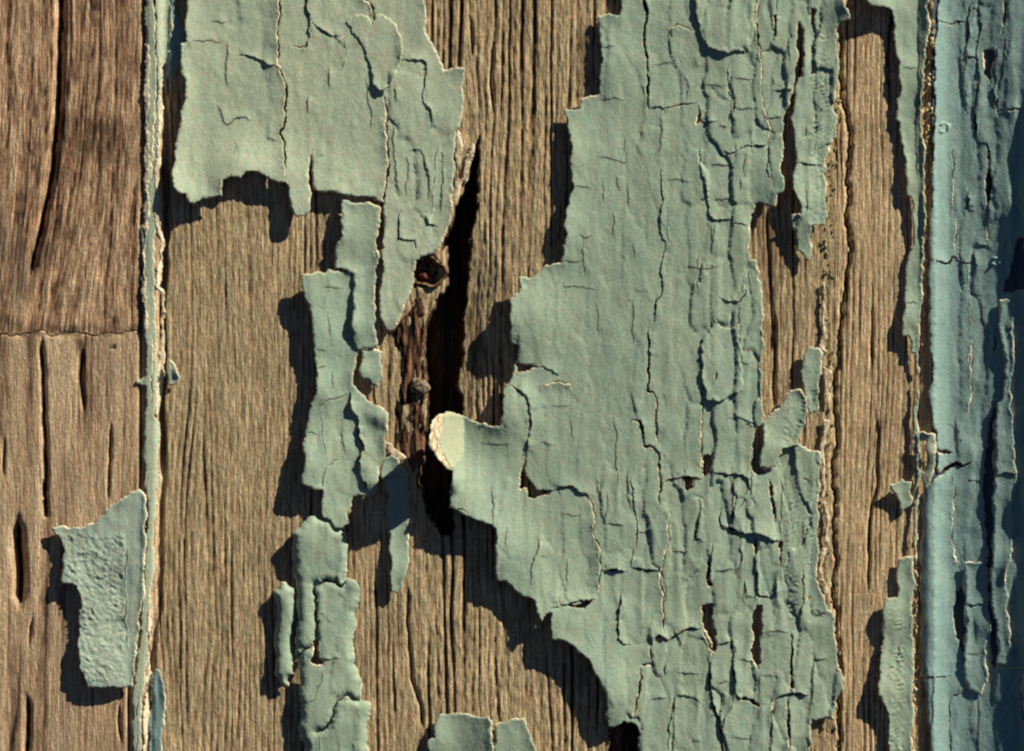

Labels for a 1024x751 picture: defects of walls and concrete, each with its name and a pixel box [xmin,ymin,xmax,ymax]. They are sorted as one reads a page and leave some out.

crack [192,0,348,167]
crack [365,78,444,241]
crack [471,26,493,98]
crack [904,0,1015,499]
peeling [52,0,475,751]
crack [487,381,573,449]
peeling [427,0,850,751]
crack [555,0,851,751]
crack [530,535,540,586]
crack [930,676,980,751]